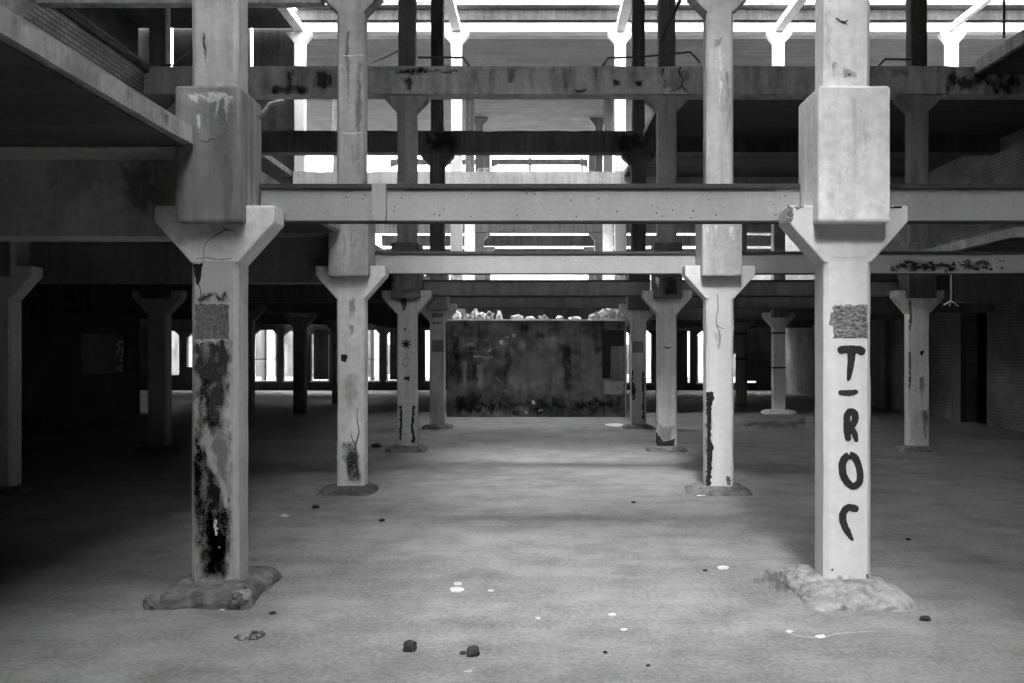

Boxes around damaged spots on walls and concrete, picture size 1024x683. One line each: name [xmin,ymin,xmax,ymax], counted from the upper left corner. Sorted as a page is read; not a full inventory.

water stain [272,72,332,94]
crack [662,67,688,92]
water stain [946,67,1019,95]
water stain [188,92,230,107]
crack [197,227,233,262]
peeling [891,259,1005,273]
crack [716,294,724,349]
water stain [455,395,621,416]
spalling [656,432,675,446]
water stain [193,340,231,578]
water stain [344,444,360,478]